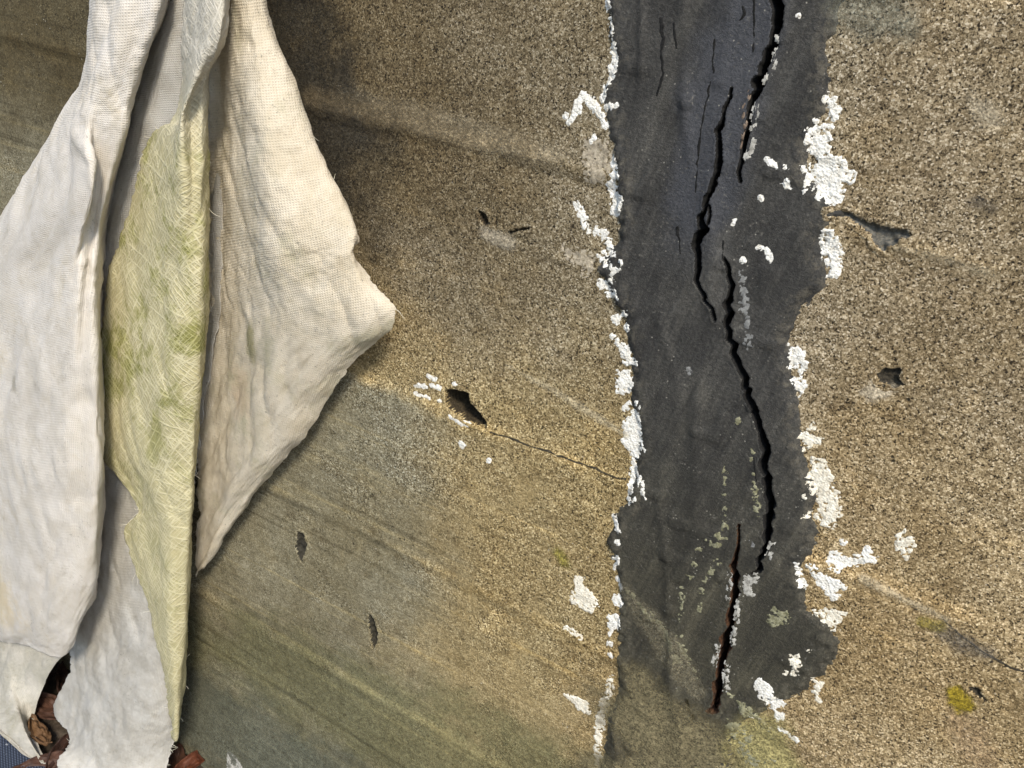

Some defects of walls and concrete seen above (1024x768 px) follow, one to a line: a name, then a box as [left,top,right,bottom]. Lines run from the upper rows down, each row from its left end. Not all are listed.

crack [656,17,678,97]
damp [762,34,779,85]
damp [743,103,760,160]
peeling [799,91,919,279]
spalling [413,374,490,435]
crack [676,0,789,722]
spalling [862,362,914,399]
crack [489,432,627,480]
spalling [293,527,310,567]
spalling [364,610,381,655]
damp [711,571,760,692]